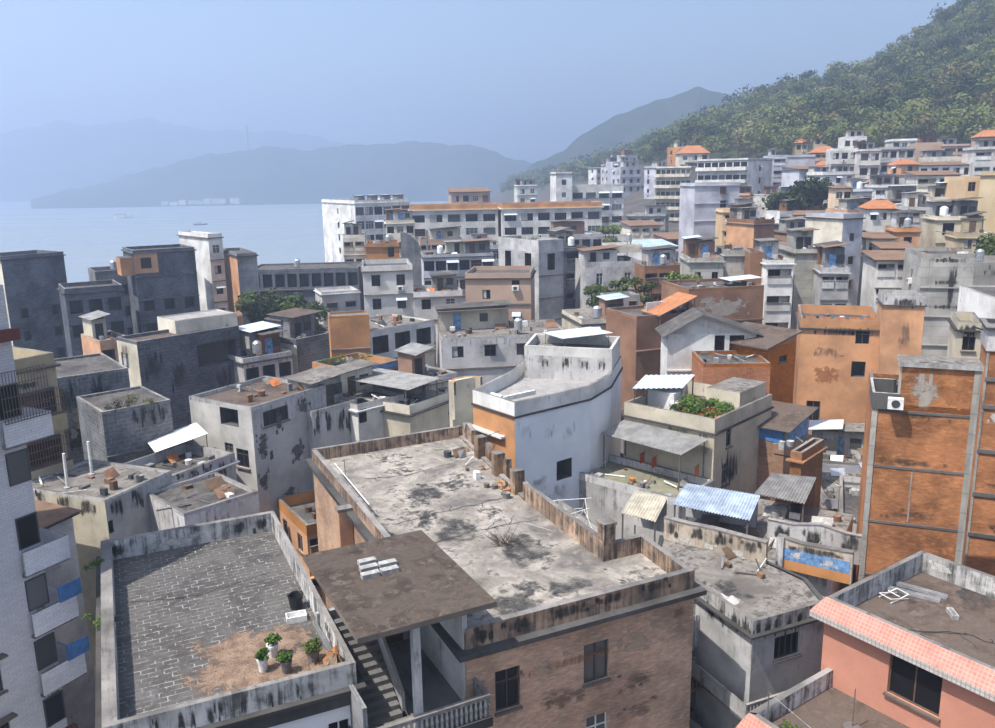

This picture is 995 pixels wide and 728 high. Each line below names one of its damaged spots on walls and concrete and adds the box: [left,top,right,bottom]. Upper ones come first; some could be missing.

peeling [918,373,936,392]
damp [133,405,165,427]
damp [314,408,351,435]
damp [234,519,266,534]
damp [715,532,761,552]
damp [555,592,620,619]
damp [474,617,528,643]
damp [178,712,196,728]
damp [207,702,223,723]